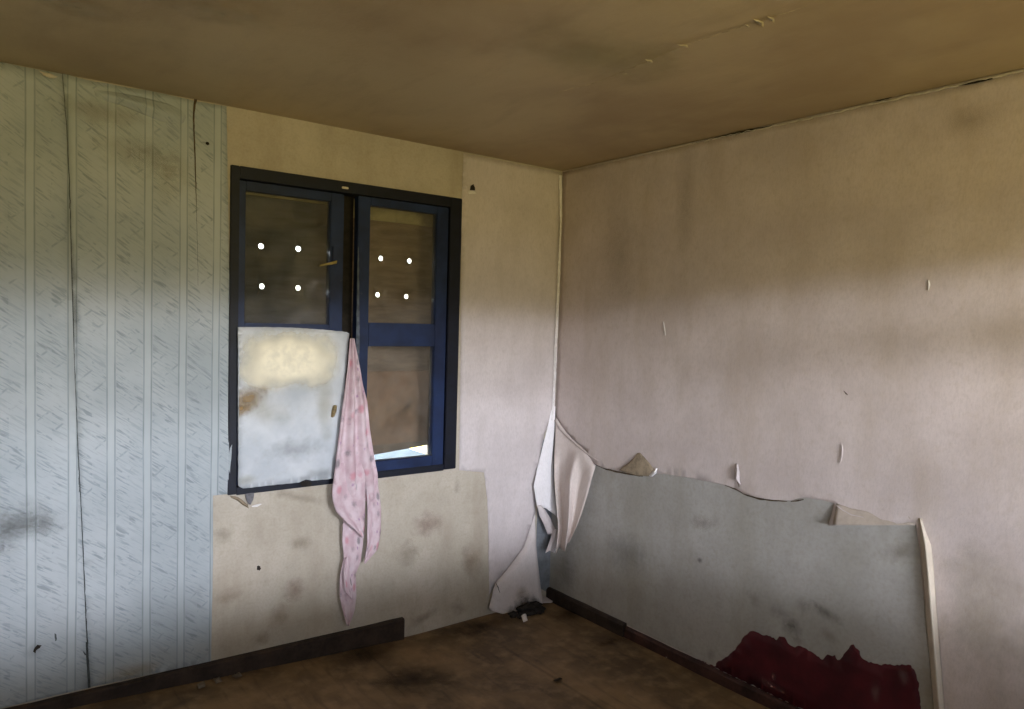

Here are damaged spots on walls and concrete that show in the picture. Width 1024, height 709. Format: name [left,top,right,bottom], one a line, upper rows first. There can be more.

crack [191,99,199,261]
crack [62,74,91,688]
peeling [536,396,934,709]